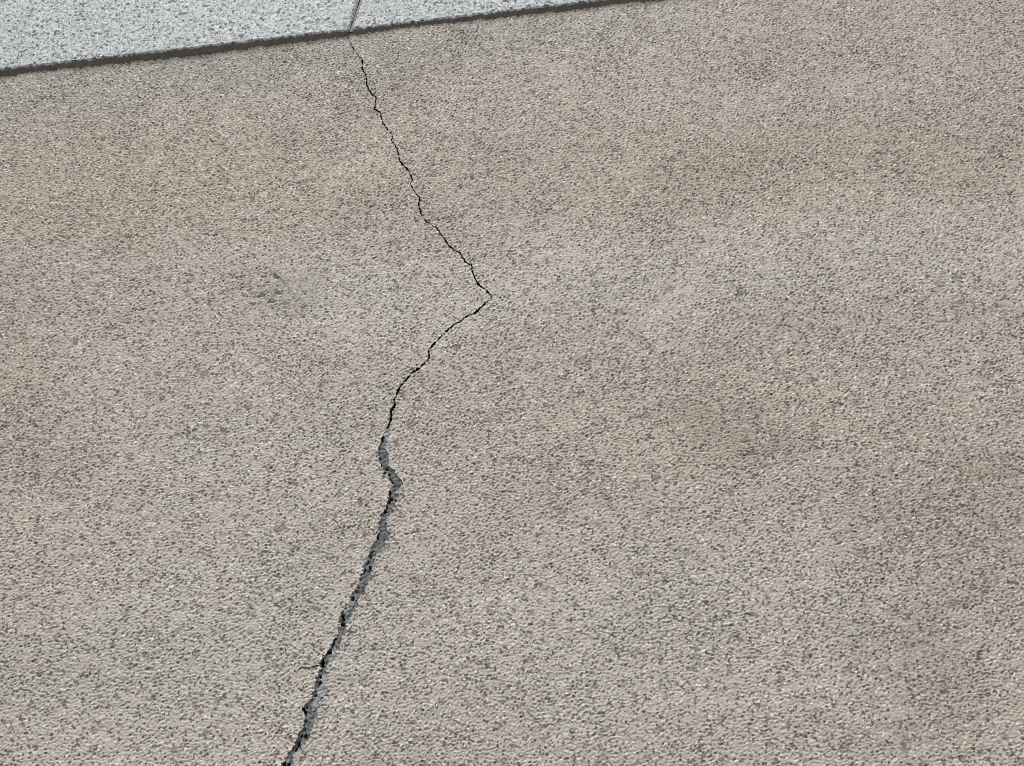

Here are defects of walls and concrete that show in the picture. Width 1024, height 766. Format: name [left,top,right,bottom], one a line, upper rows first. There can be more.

crack [281,38,492,766]